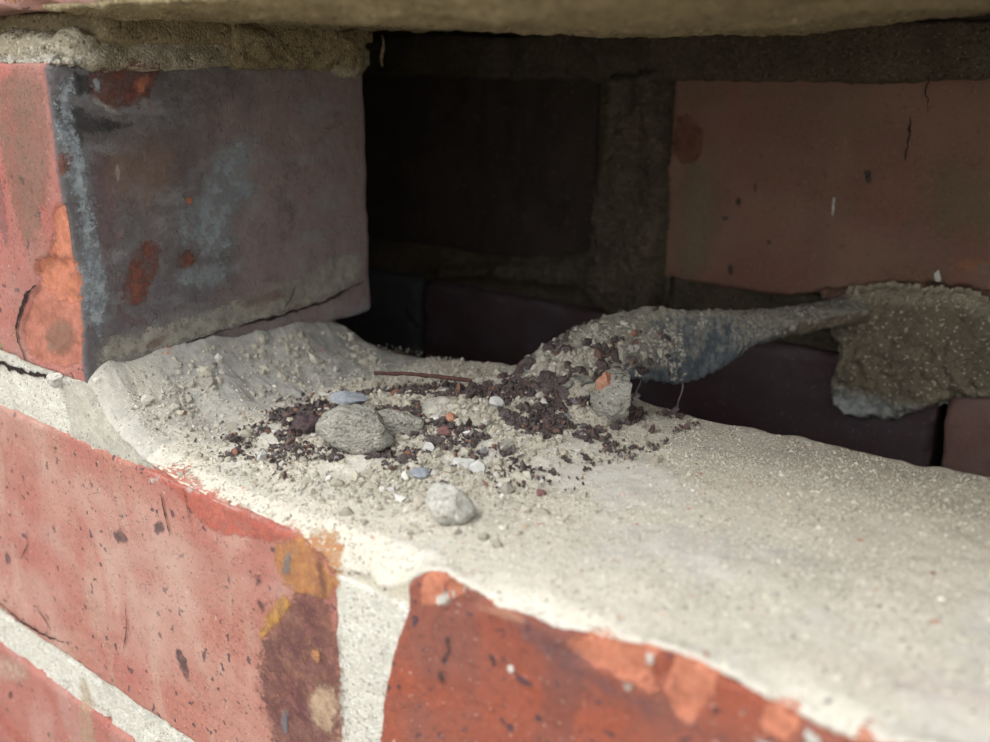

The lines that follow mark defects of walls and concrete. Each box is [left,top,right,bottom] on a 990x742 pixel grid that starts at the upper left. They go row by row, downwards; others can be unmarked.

crack [904,77,930,161]
leakage [53,73,364,367]
crack [0,285,47,378]
spalling [24,204,86,367]
spalling [420,569,478,606]
spalling [564,627,720,727]
spalling [760,698,802,740]